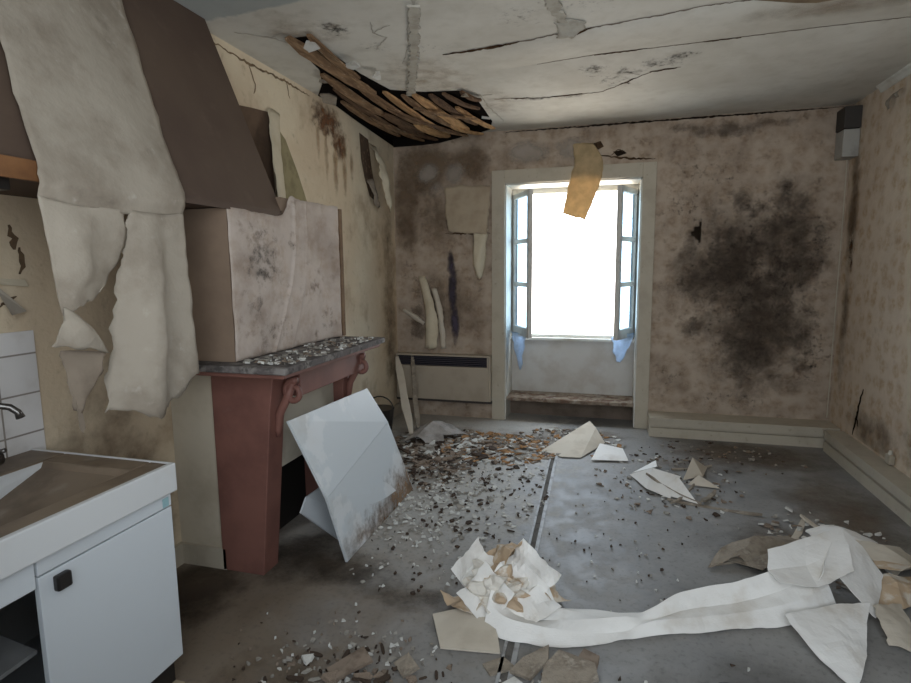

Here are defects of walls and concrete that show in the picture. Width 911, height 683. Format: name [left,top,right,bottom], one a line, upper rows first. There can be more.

crack [443,0,831,55]
peeling [304,40,320,53]
crack [501,17,906,99]
crack [506,107,836,133]
crack [601,149,655,160]